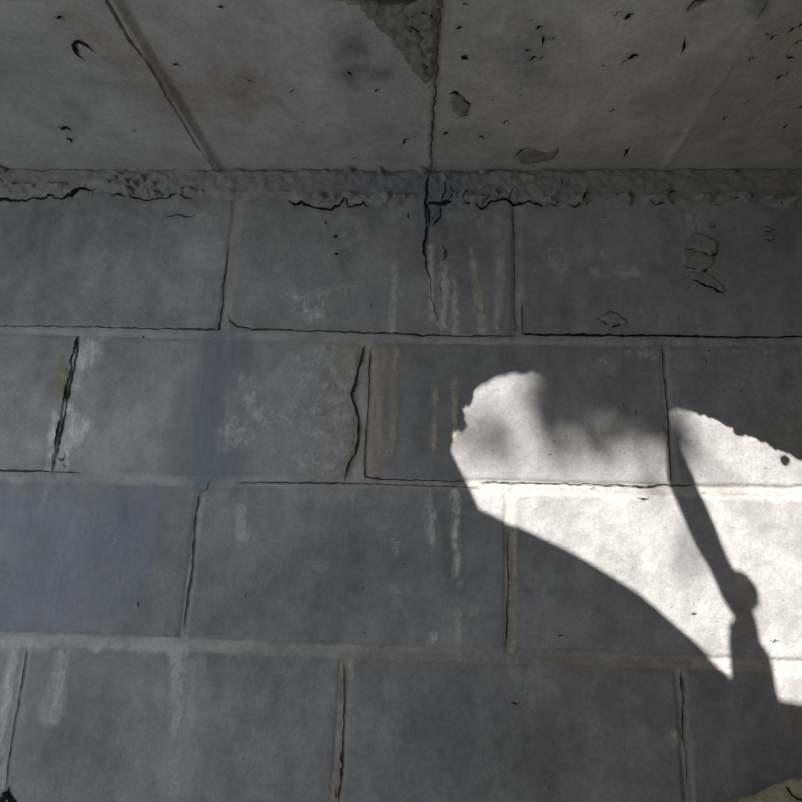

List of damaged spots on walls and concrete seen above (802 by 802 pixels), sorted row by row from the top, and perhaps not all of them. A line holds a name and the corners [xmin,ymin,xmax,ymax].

spalling [338,0,444,84]
crack [0,0,802,499]
water stain [428,244,459,335]
spalling [681,234,726,293]
water stain [72,338,102,391]
water stain [47,402,92,472]
crack [175,481,210,636]
crack [503,537,511,650]